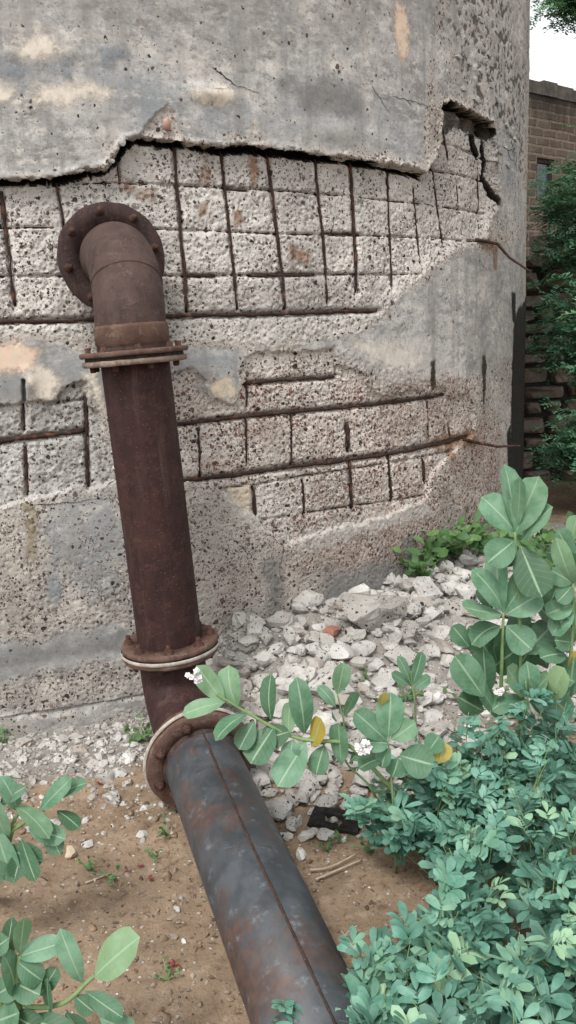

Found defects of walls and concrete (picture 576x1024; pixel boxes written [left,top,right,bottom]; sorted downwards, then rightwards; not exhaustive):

spalling [0,0,531,548]